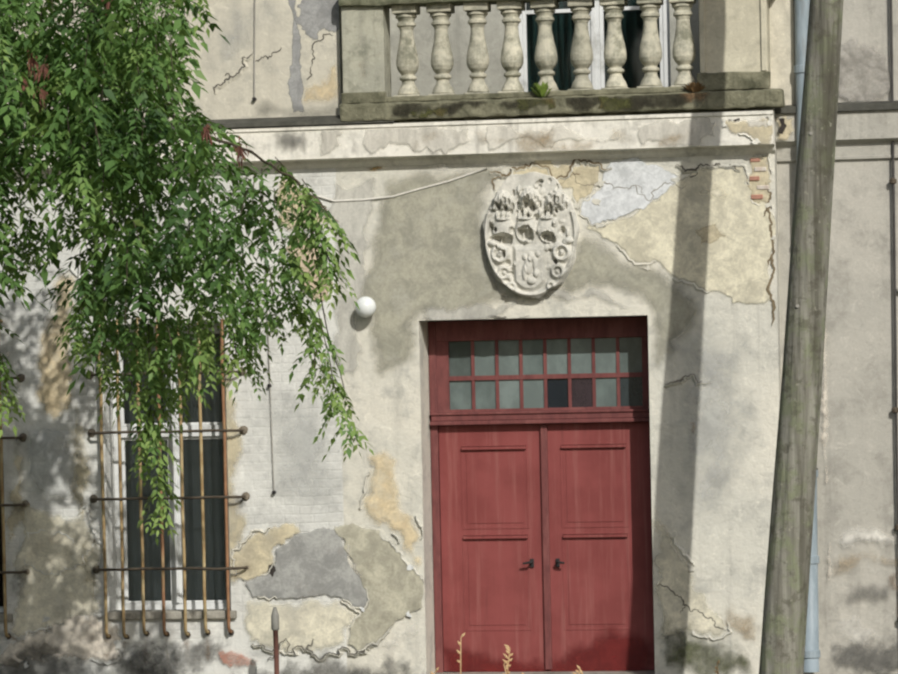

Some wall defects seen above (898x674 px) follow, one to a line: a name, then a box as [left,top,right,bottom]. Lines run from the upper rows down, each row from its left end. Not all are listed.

crack [213,0,333,112]
crack [489,159,740,201]
flaking render [500,153,776,304]
crack [763,189,776,324]
peeling [38,267,80,417]
crack [664,374,711,388]
flaking render [231,523,300,580]
peeling [359,455,424,582]
flaking render [245,588,370,656]
crack [656,584,726,631]
water stain [0,643,71,674]
water stain [125,642,221,674]